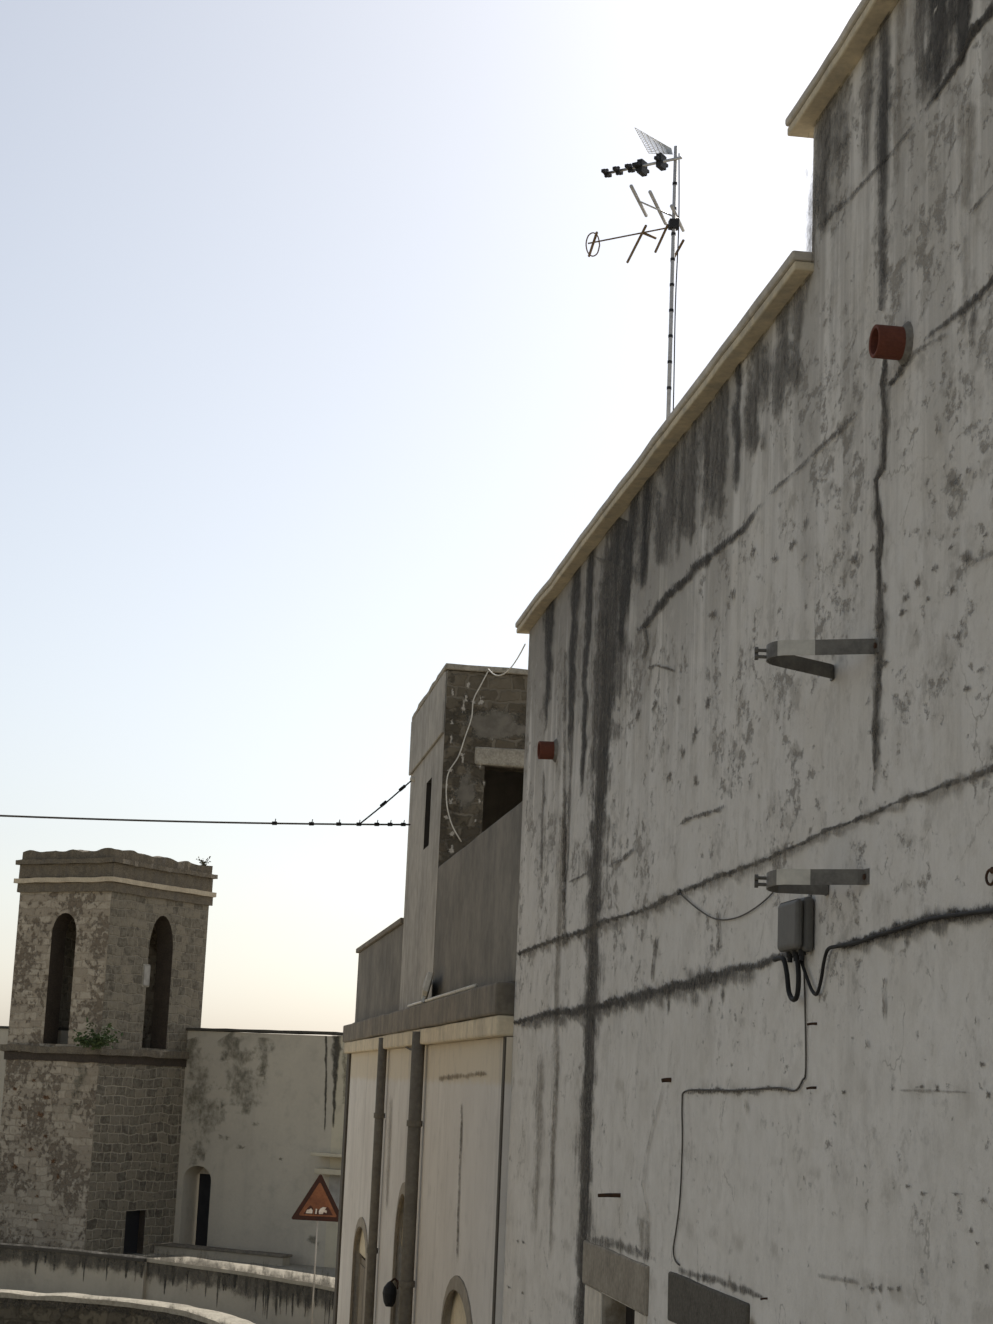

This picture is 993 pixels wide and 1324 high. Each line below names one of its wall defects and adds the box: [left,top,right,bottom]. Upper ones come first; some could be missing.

crack [818,1,993,227]
leakage [914,0,971,97]
leakage [543,599,554,724]
leakage [555,14,899,1324]
crack [513,275,993,1027]